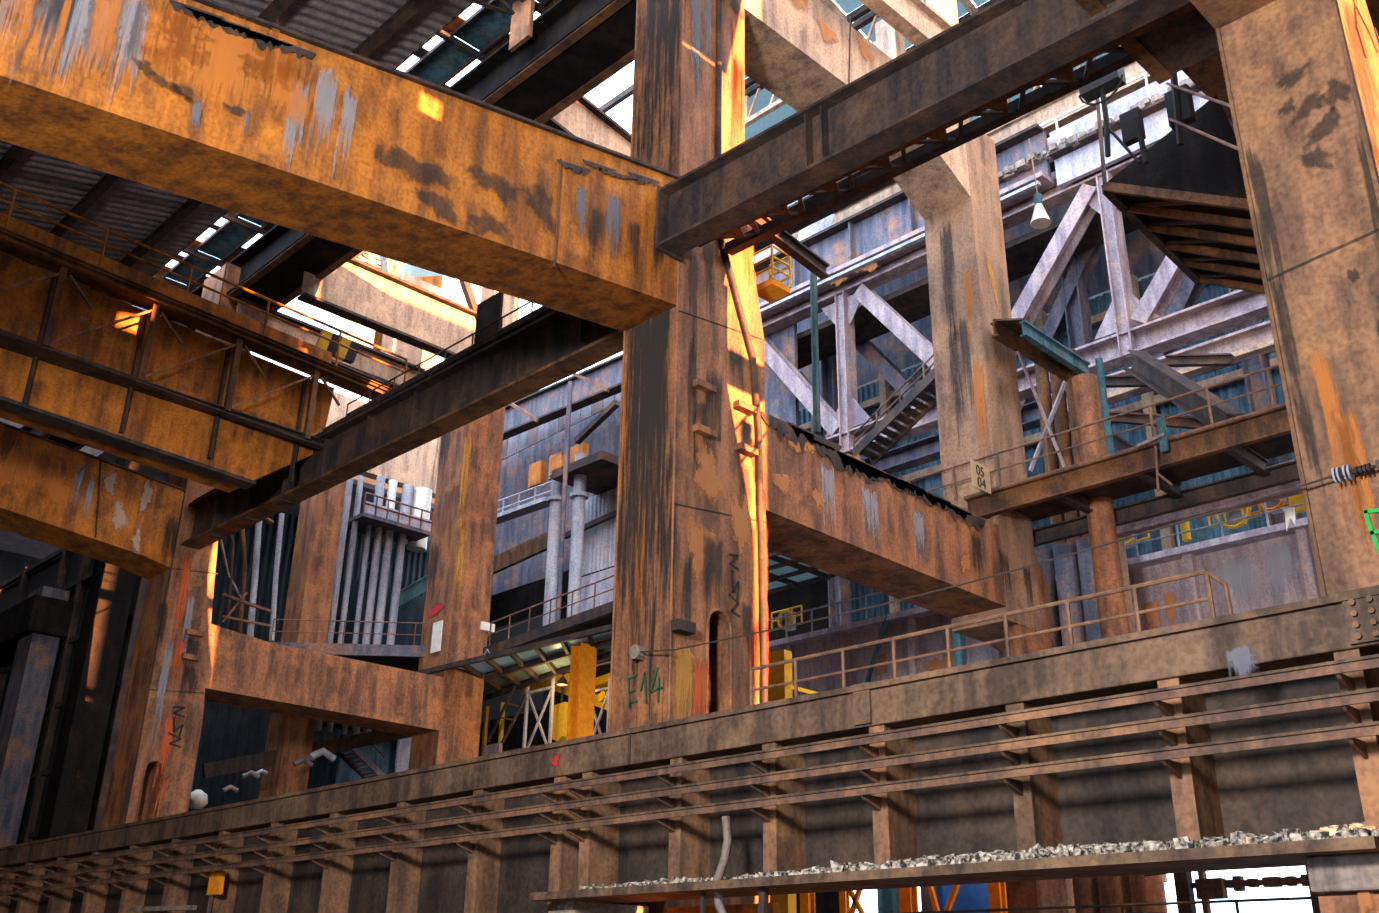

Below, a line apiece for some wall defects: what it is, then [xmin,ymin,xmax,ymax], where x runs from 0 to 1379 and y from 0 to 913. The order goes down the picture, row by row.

leakage [0,0,148,79]
leakage [191,99,203,125]
leakage [284,69,357,170]
corrosion [744,225,756,282]
peeling [104,472,153,551]
corrosion [453,435,472,603]
peeling [761,411,985,531]
corrosion [1313,354,1374,530]